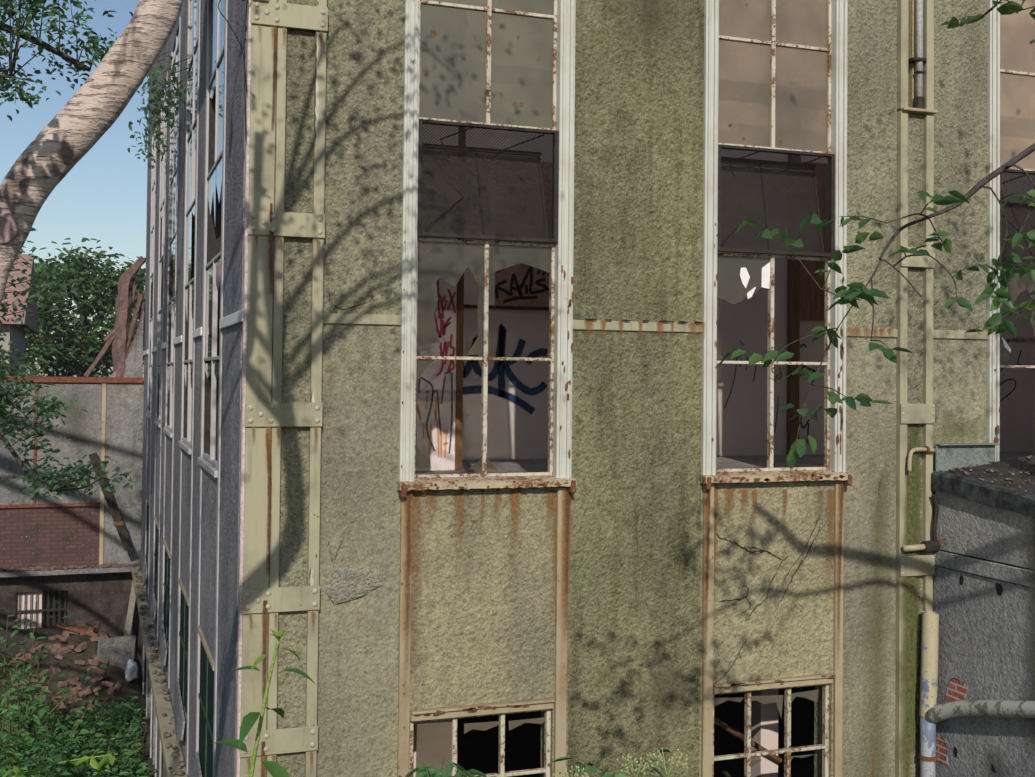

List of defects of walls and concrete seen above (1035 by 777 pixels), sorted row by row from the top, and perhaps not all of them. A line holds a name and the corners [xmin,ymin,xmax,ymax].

corrosion [272,26,285,129]
corrosion [255,203,282,293]
corrosion [252,427,280,573]
corrosion [482,487,520,523]
crack [714,510,825,684]
corrosion [249,600,277,698]
flaking render [945,678,968,701]